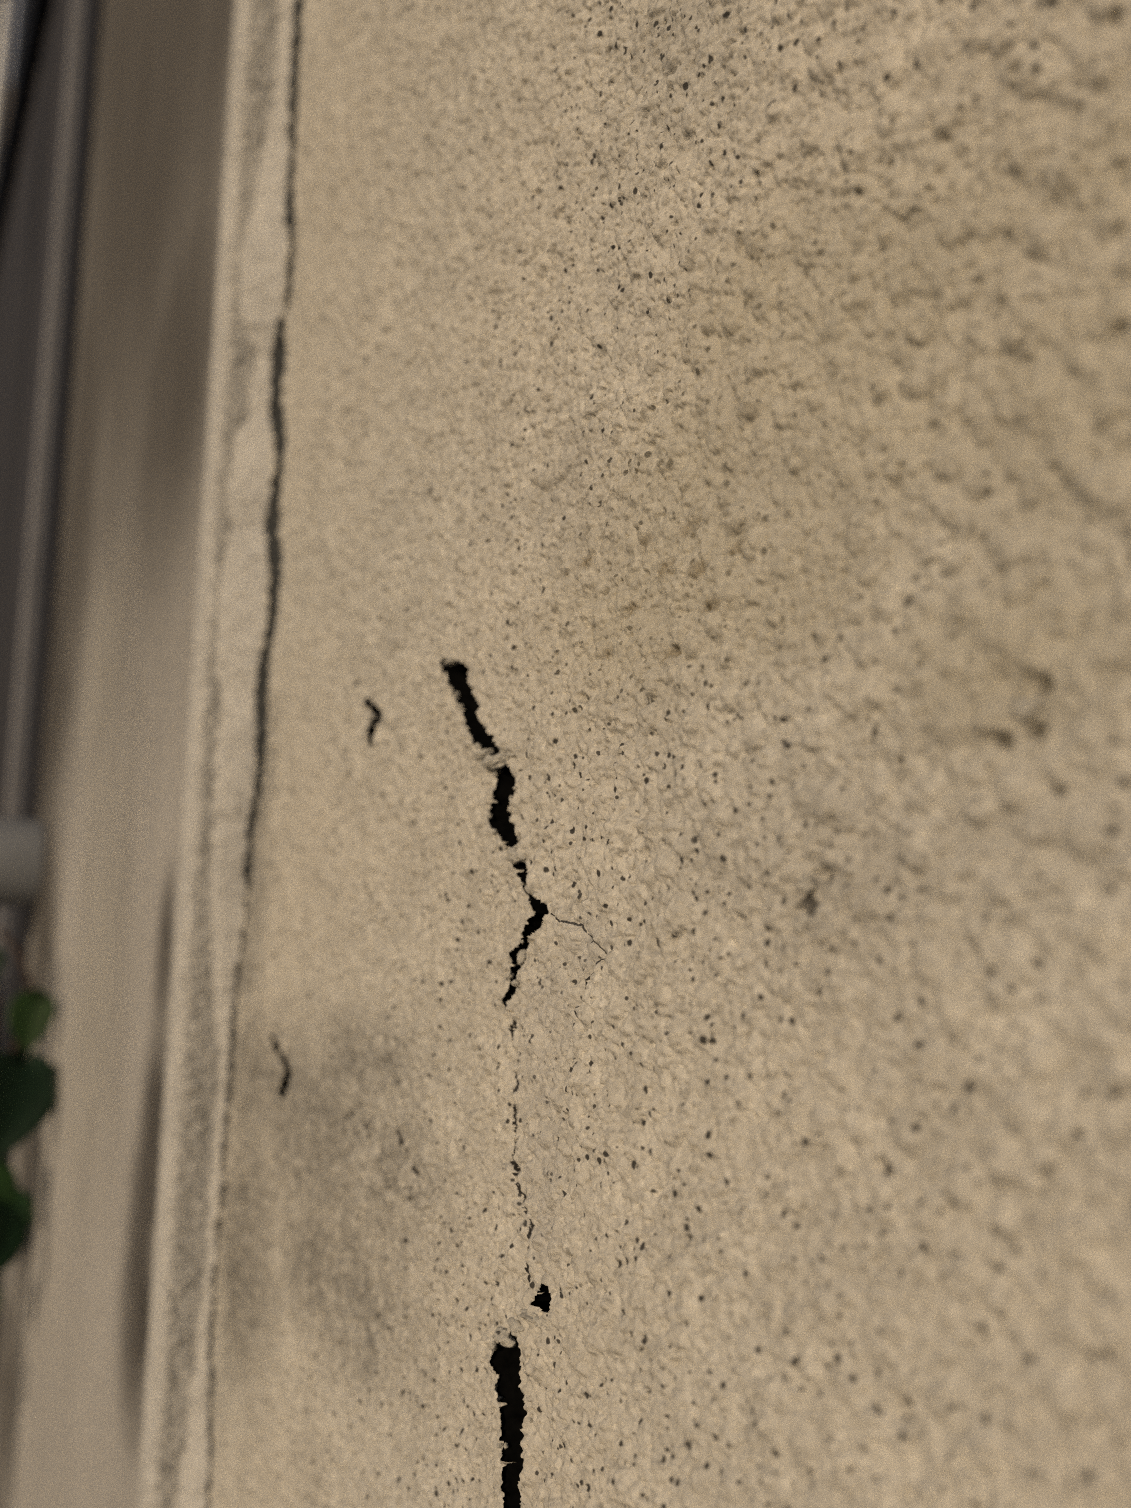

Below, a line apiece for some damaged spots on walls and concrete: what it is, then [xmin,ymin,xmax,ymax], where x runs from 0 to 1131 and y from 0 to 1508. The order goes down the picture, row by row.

crack [205,0,420,1508]
crack [440,657,607,1508]